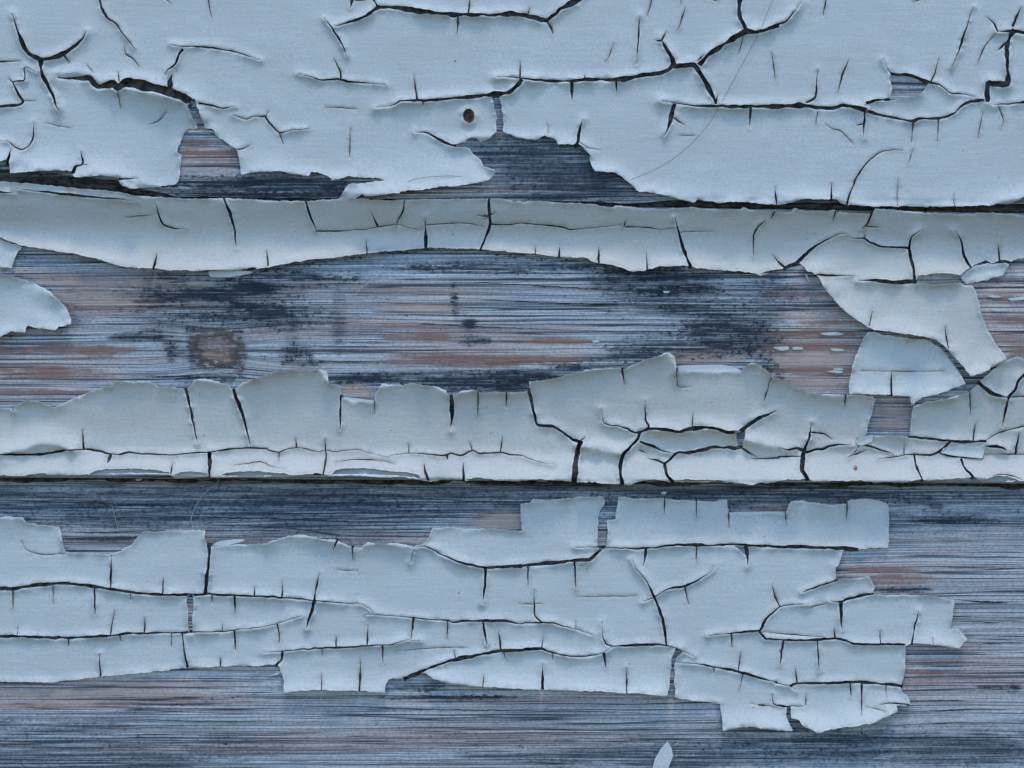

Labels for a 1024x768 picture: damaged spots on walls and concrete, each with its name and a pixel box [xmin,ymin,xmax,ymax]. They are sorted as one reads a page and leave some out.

crack [0,0,304,229]
crack [223,197,236,243]
peeling [0,0,1024,485]
crack [304,0,1024,285]
crack [889,330,948,396]
peeling [0,491,967,733]
crack [0,361,1024,726]
peeling [653,742,673,768]